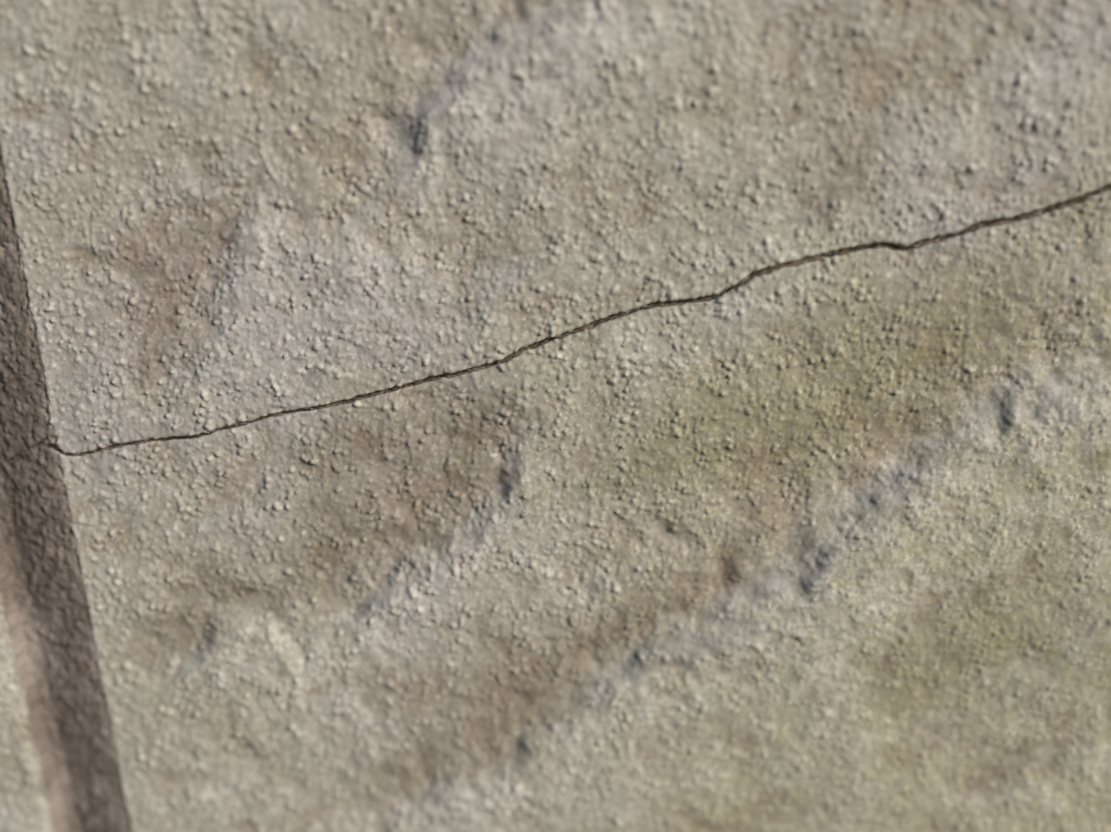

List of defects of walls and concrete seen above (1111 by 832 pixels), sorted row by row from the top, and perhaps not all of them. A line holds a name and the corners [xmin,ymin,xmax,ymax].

crack [8,183,1111,461]